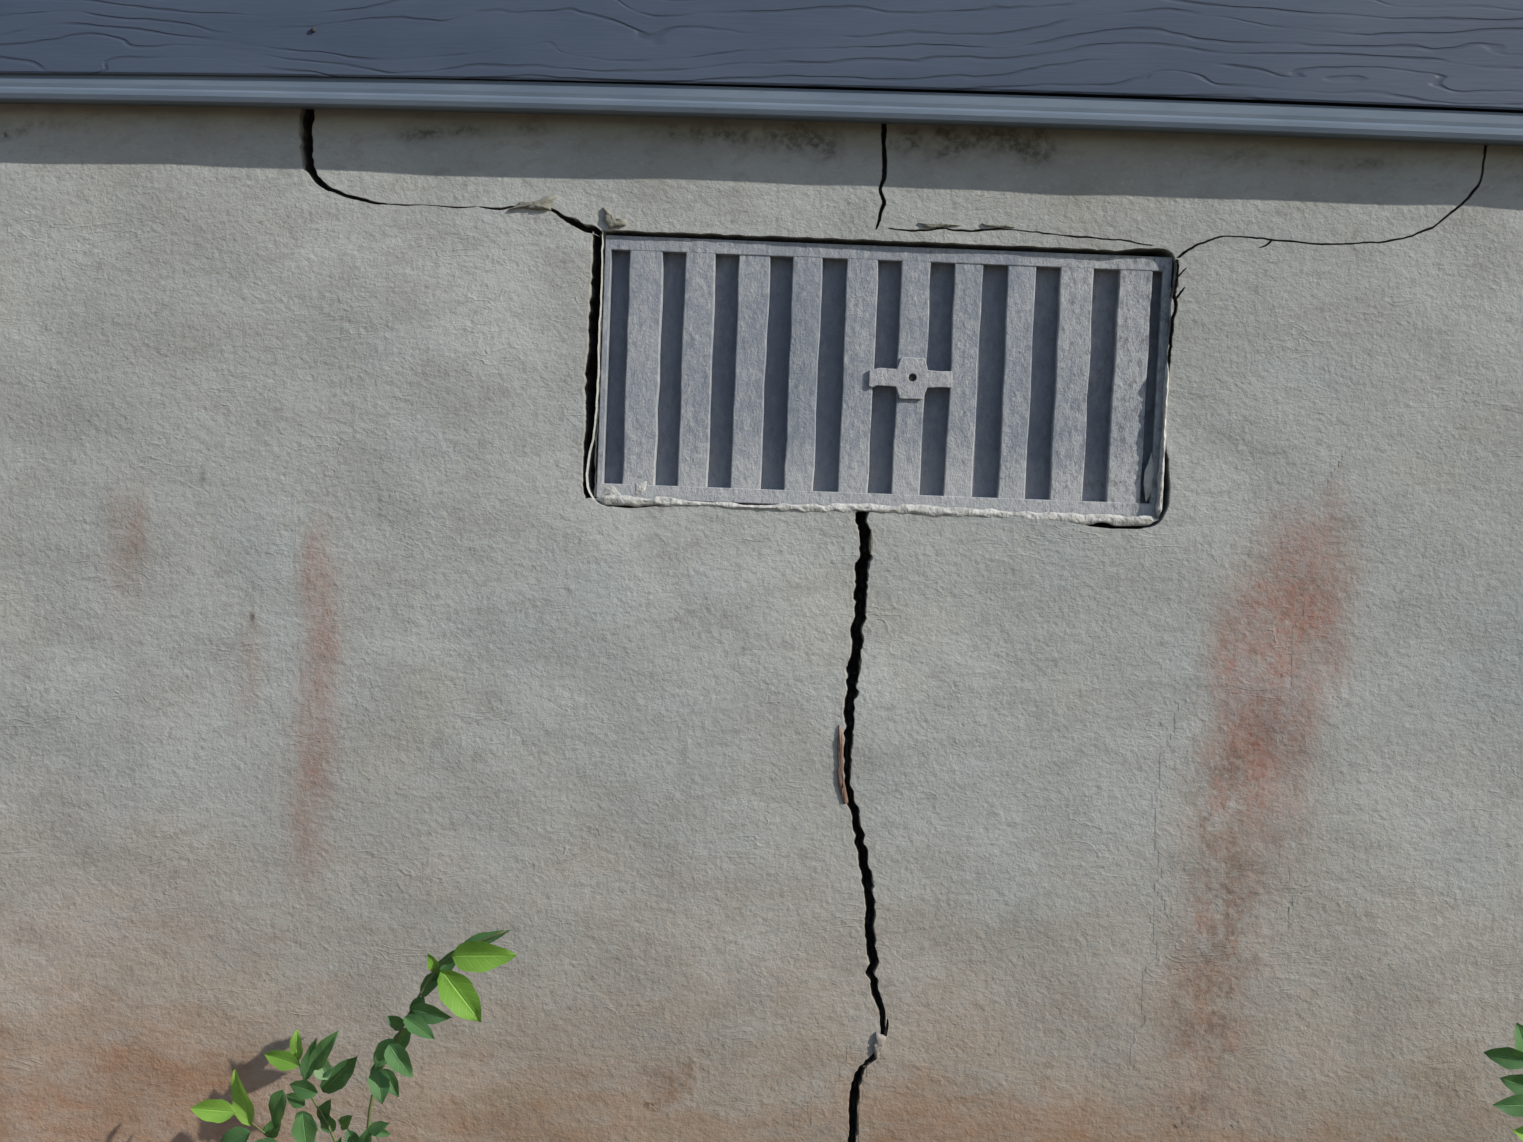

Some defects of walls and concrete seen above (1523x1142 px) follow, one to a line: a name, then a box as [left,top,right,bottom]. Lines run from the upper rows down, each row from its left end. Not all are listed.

crack [298,109,627,499]
crack [875,124,1488,420]
crack [837,511,889,1142]
rust [1130,447,1390,1142]